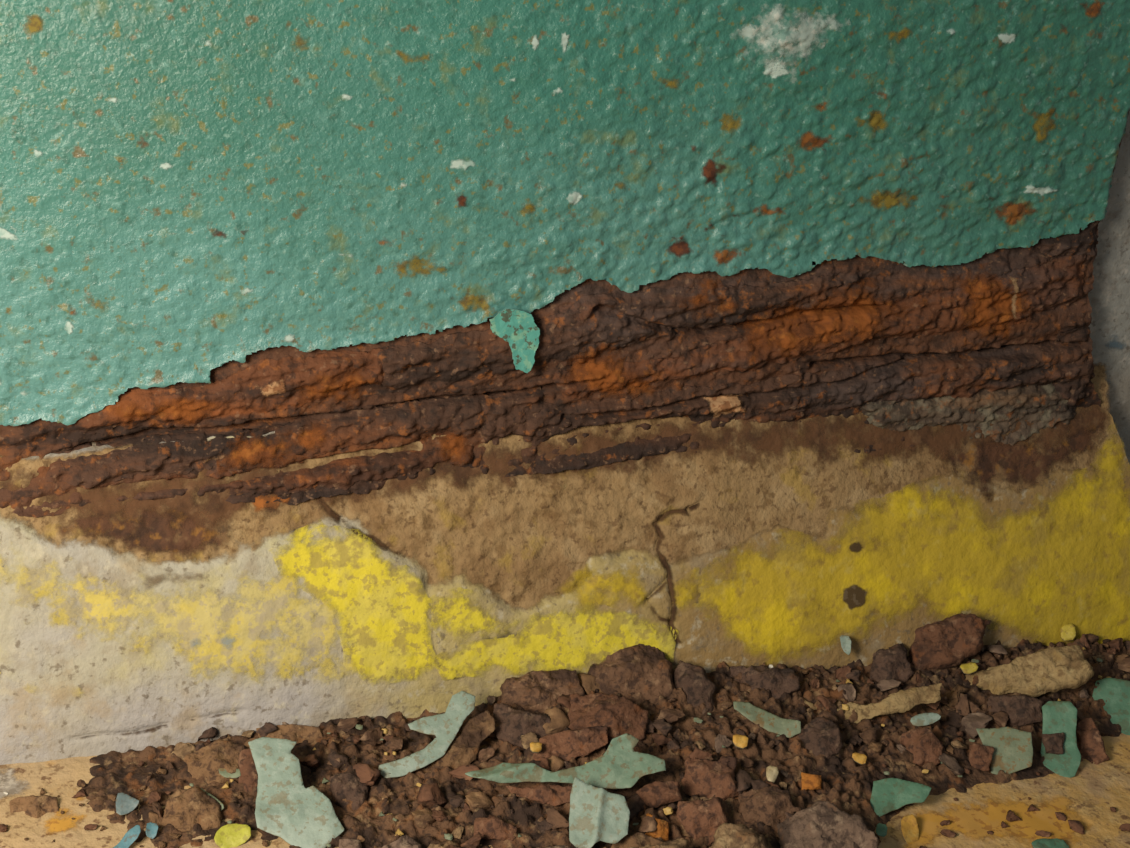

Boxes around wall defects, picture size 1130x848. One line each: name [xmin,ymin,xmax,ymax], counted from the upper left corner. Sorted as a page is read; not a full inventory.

corrosion [0,220,1106,555]
spalling [0,362,1130,682]
crack [646,503,699,644]
peeling [530,742,542,753]
peeling [733,734,748,749]
peeling [766,766,779,783]
peeling [852,752,867,765]
peeling [910,713,941,727]
peeling [976,701,1081,778]
peeling [906,797,1089,848]